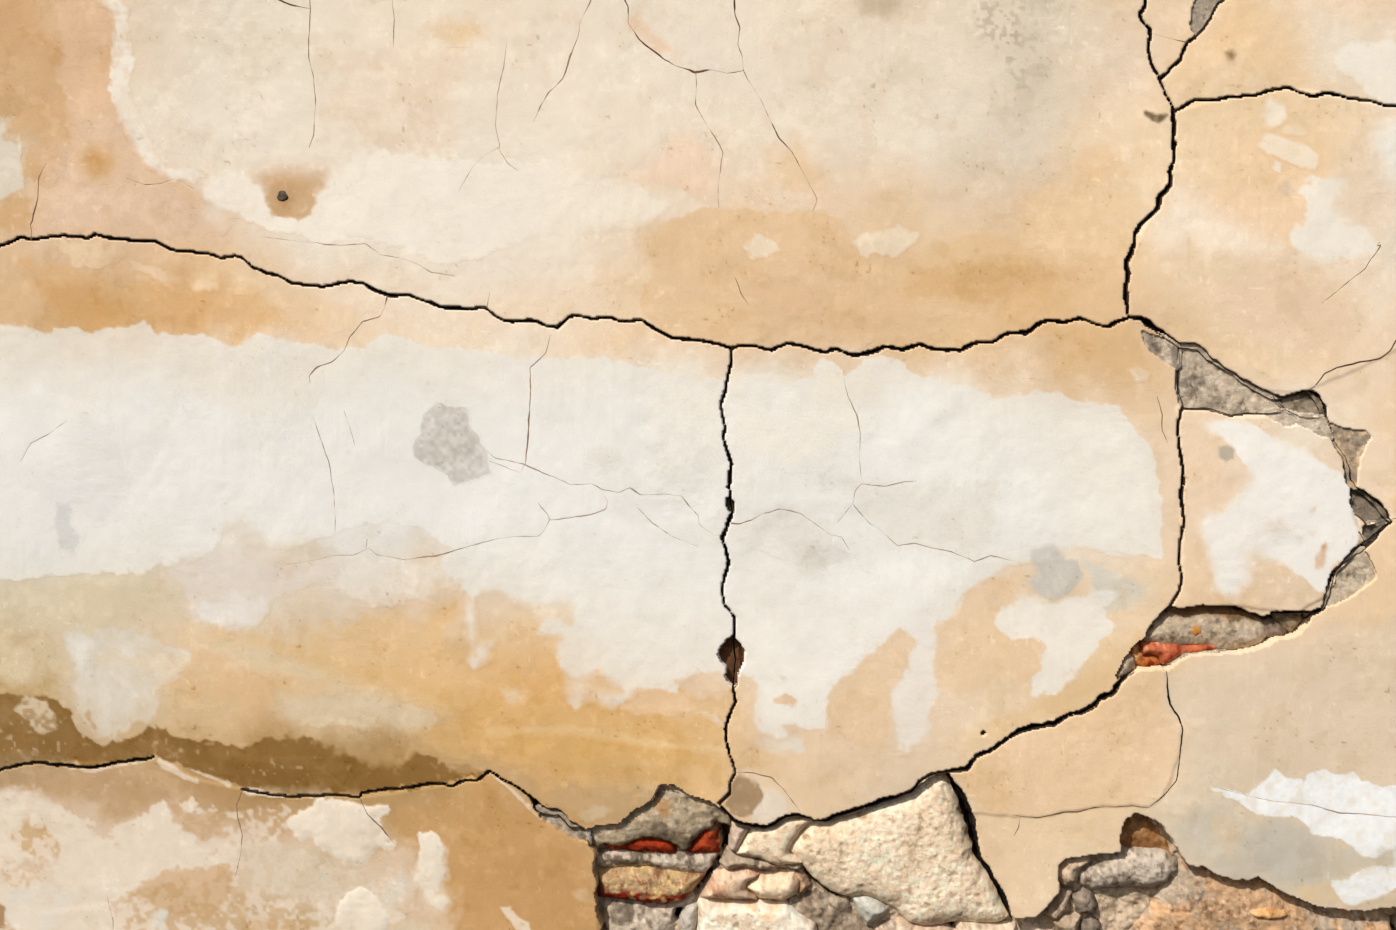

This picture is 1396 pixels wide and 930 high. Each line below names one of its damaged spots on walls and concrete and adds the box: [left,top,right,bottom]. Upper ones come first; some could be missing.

spalling [1189,0,1224,40]
crack [0,0,1396,357]
crack [1167,369,1252,611]
peeling [1141,331,1392,665]
crack [1271,439,1396,620]
crack [0,756,154,771]
damp [0,621,753,829]
crack [235,770,596,876]
spalling [491,770,903,930]
crack [719,350,1133,919]
spalling [1059,813,1396,930]
peeling [1206,768,1396,848]